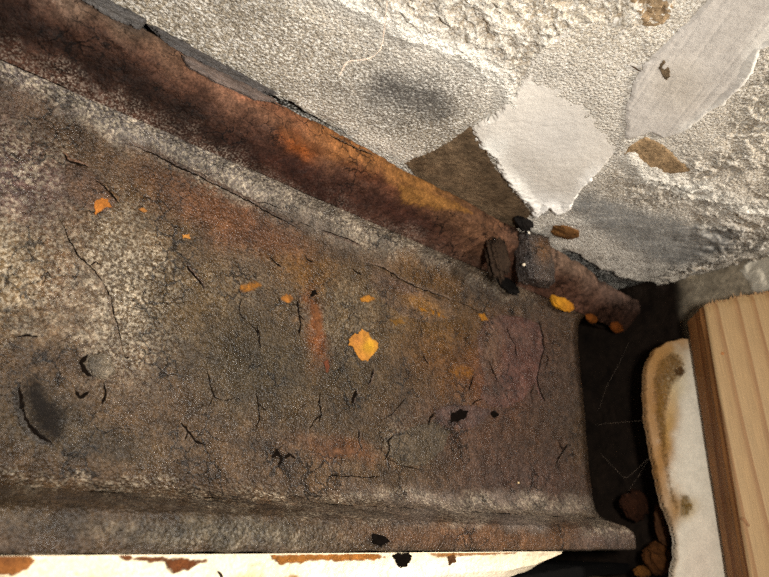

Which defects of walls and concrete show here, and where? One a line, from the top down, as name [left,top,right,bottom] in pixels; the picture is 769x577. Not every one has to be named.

spalling [630,0,674,27]
corrosion [83,0,279,102]
flaking render [404,52,690,229]
corrosion [94,198,111,215]
crack [122,140,480,314]
corrosion [513,215,534,232]
crack [57,216,129,359]
flaking render [739,257,769,293]
corrosion [348,329,378,361]
crack [75,354,107,404]
crack [271,448,296,467]
corrosion [0,556,35,576]